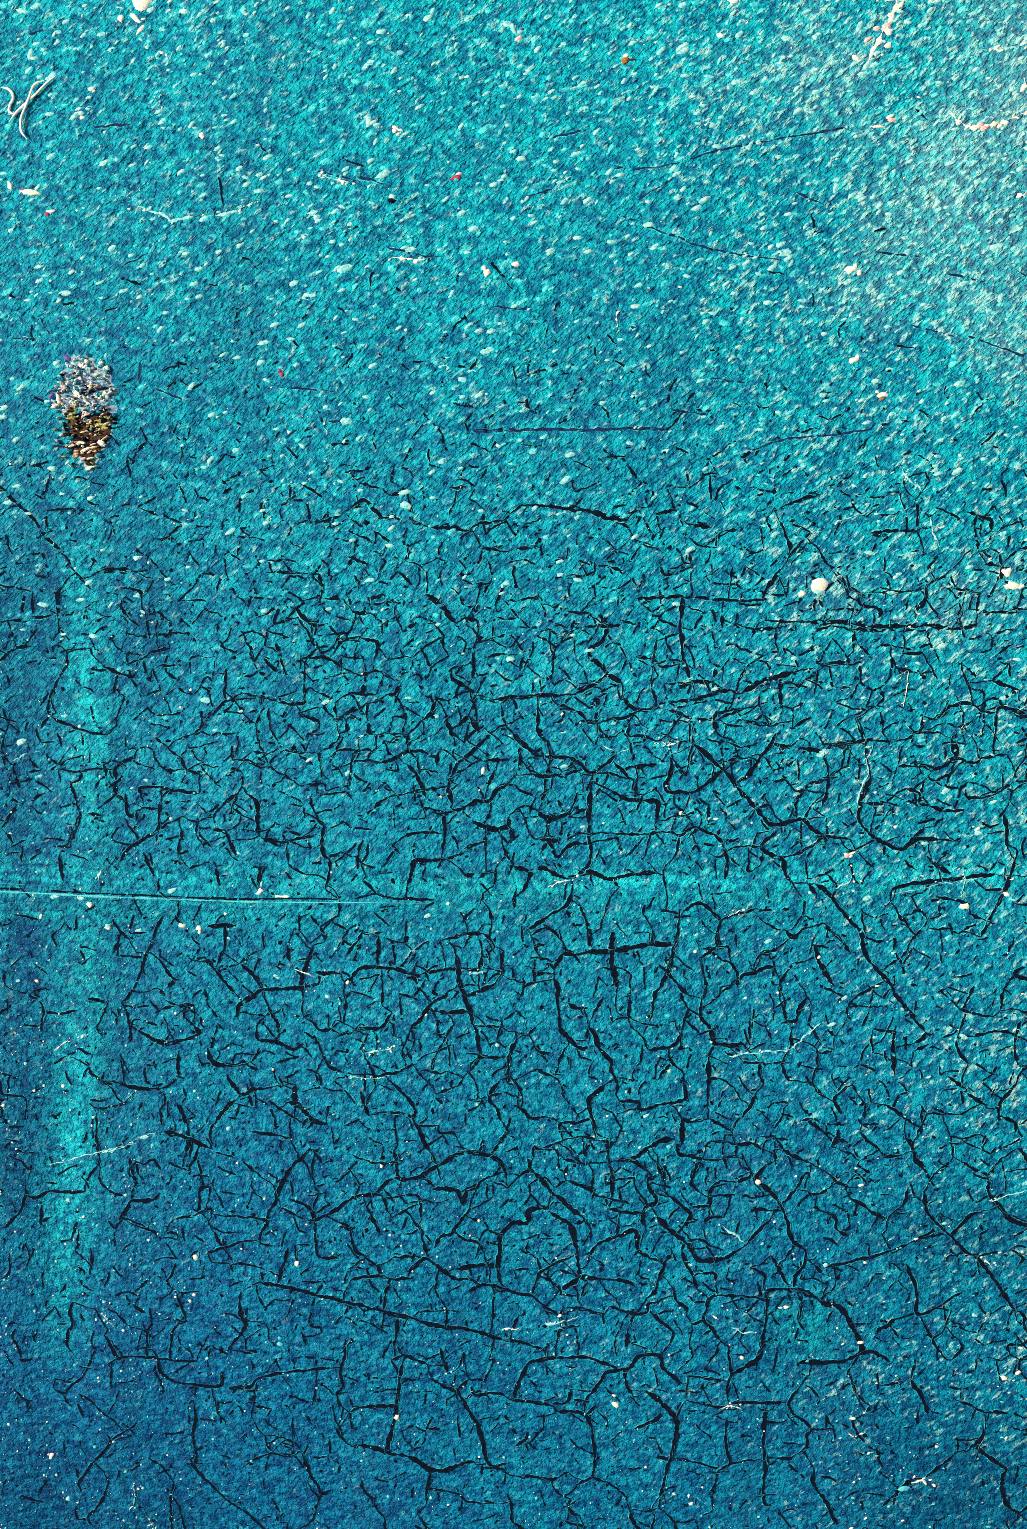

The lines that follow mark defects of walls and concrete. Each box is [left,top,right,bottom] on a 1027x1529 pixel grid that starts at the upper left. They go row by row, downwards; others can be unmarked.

crack [358,247,460,292]
crack [482,262,513,290]
crack [874,227,1027,282]
peeling [46,352,118,471]
crack [121,350,234,408]
crack [262,326,423,422]
crack [440,315,486,370]
crack [495,305,583,428]
crack [587,310,651,382]
crack [633,347,745,430]
crack [896,320,1024,359]
crack [0,375,1027,1529]